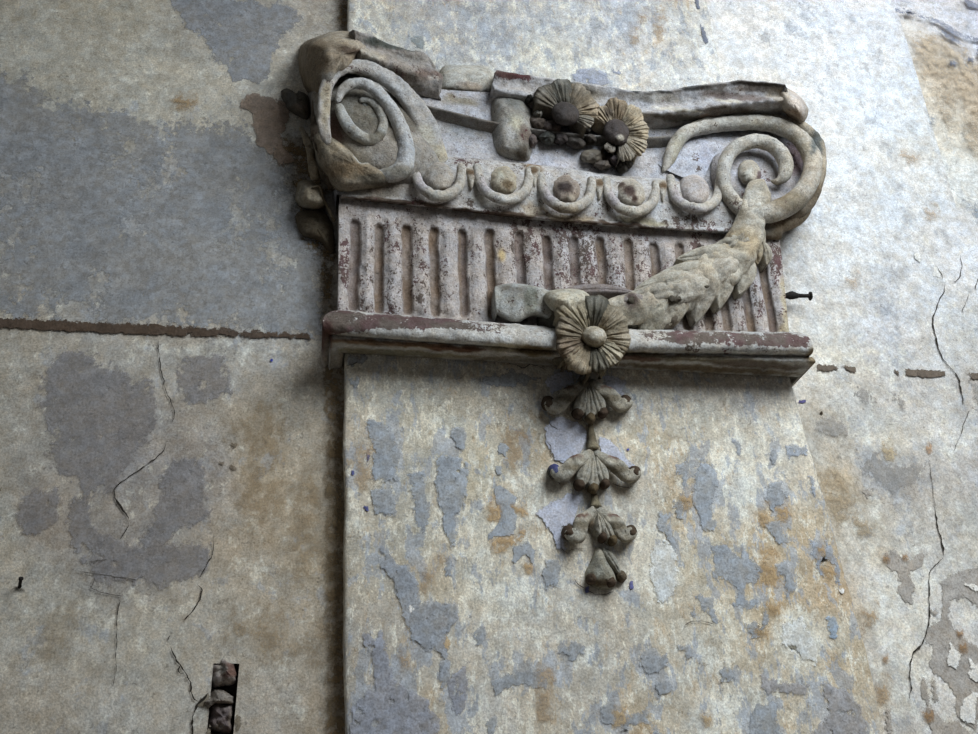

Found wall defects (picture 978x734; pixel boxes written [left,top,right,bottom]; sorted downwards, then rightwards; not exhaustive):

leakage [279,134,328,212]
leakage [301,235,336,313]
crack [932,258,978,450]
peeling [544,417,587,463]
crack [113,444,166,536]
peeling [366,419,470,577]
peeling [488,443,583,589]
crack [185,540,214,619]
crack [909,468,945,698]
crack [167,636,208,734]
spalling [198,659,241,734]
peeling [919,566,978,734]